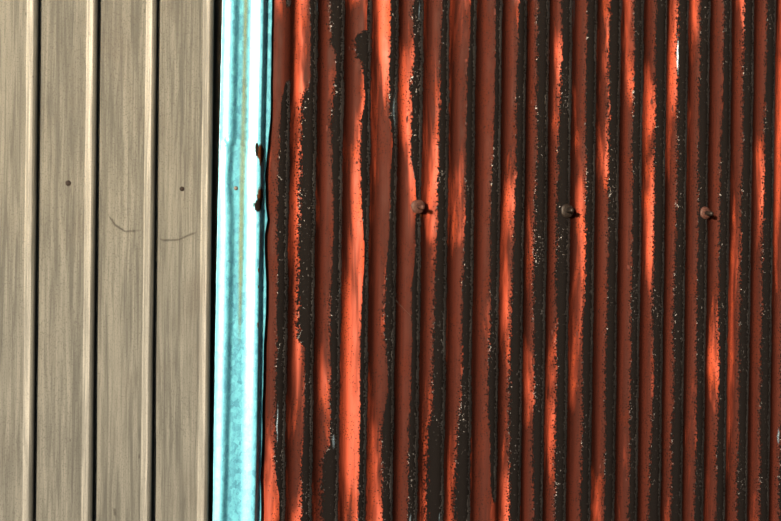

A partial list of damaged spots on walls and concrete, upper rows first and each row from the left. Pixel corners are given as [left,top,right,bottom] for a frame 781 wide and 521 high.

rust [255,142,264,166]